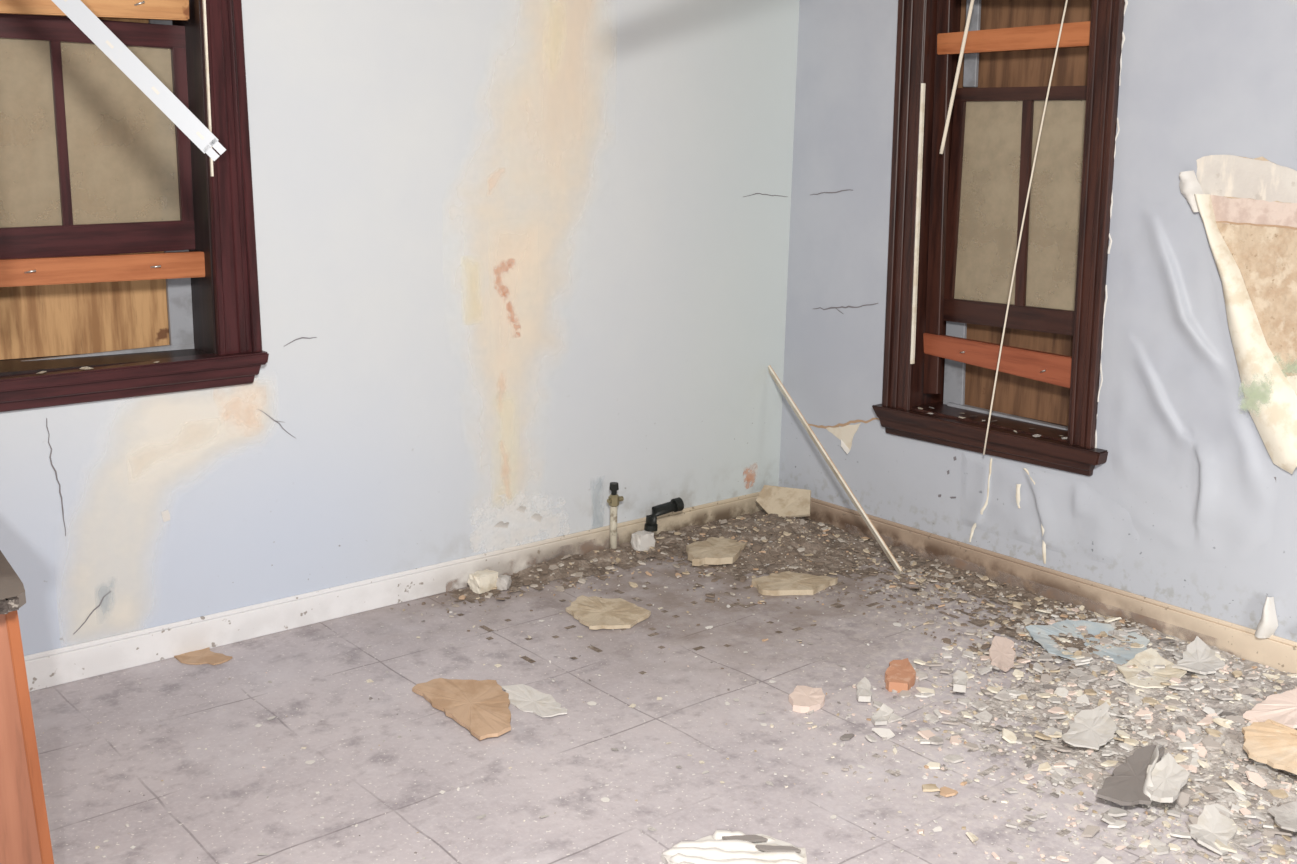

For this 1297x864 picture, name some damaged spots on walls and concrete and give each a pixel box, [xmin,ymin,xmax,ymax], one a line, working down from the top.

water stain [466,0,619,566]
spalling [1196,155,1297,396]
crack [46,418,66,536]
water stain [67,382,271,641]